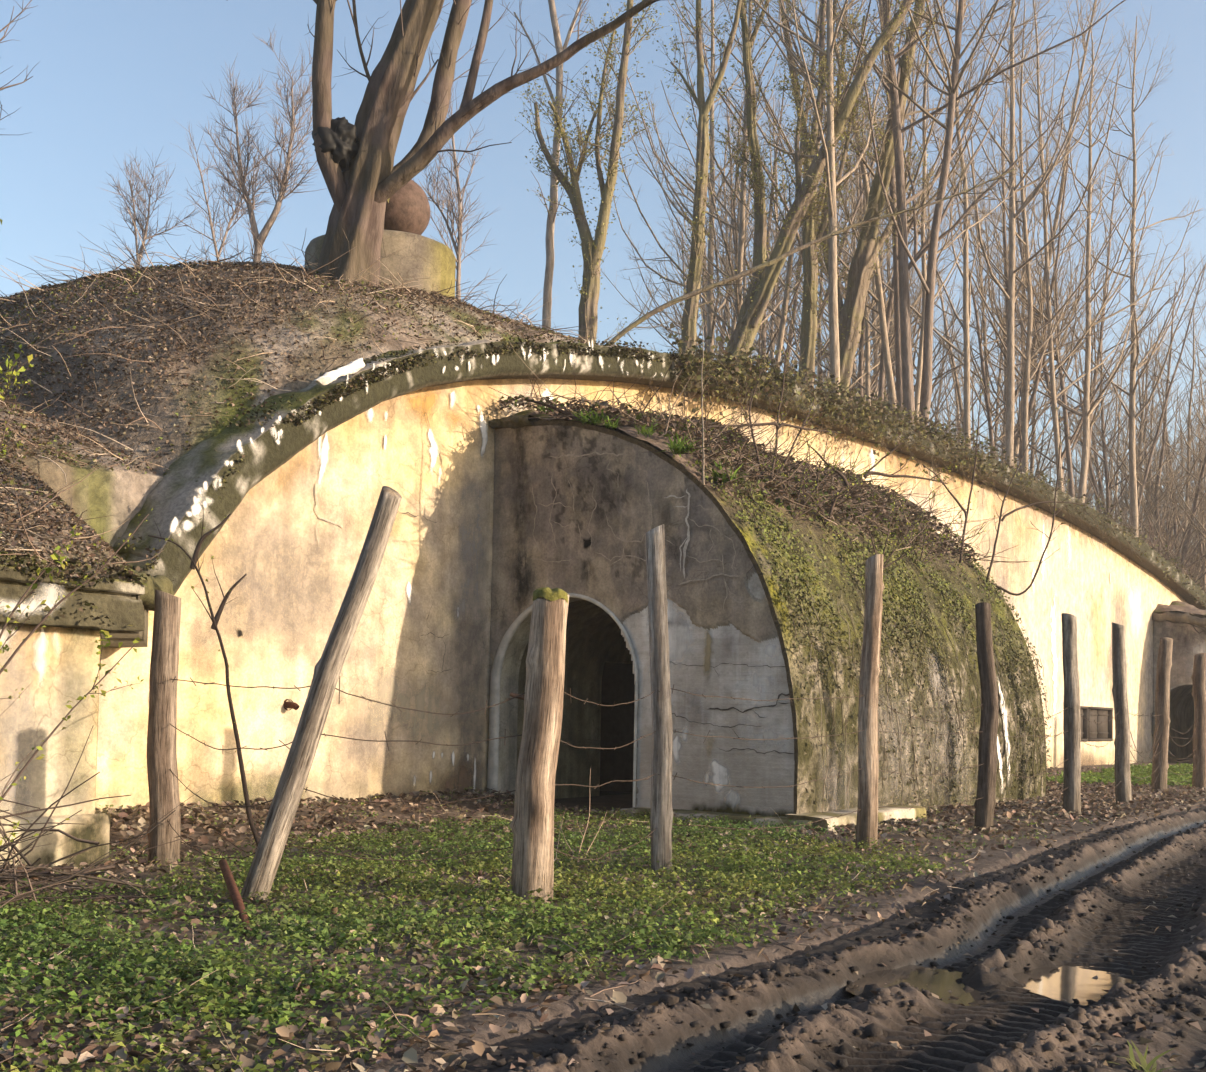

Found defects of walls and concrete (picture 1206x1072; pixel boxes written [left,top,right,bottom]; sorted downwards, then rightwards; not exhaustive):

leakage [515,429,529,609]
spalling [619,606,652,808]
crack [531,451,754,612]
spalling [667,599,795,815]
spalling [748,572,765,600]
leakage [997,684,1010,780]
leakage [1050,597,1058,715]